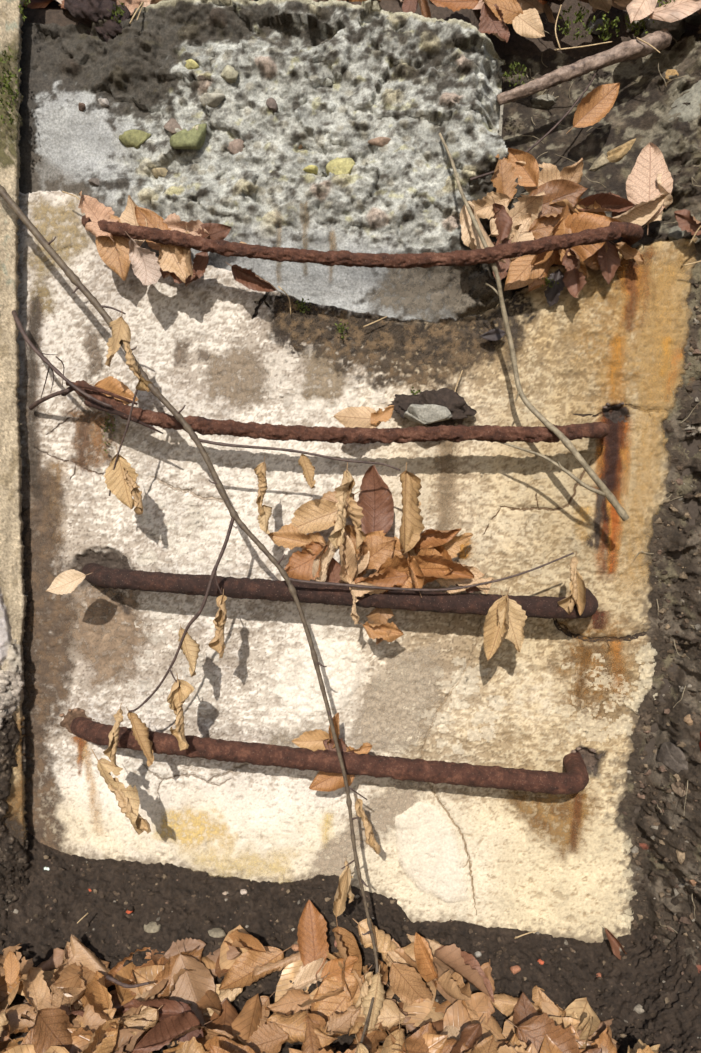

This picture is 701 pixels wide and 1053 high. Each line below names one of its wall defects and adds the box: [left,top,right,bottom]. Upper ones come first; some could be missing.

spalling [18,0,528,324]
corrosion [587,247,680,395]
corrosion [62,382,163,470]
peeling [260,342,387,416]
spalling [602,402,630,423]
crack [484,459,599,534]
corrosion [580,411,630,572]
crack [553,618,647,653]
peeling [371,656,508,754]
peeling [555,642,658,770]
crack [421,618,482,916]
corrosion [509,791,593,858]